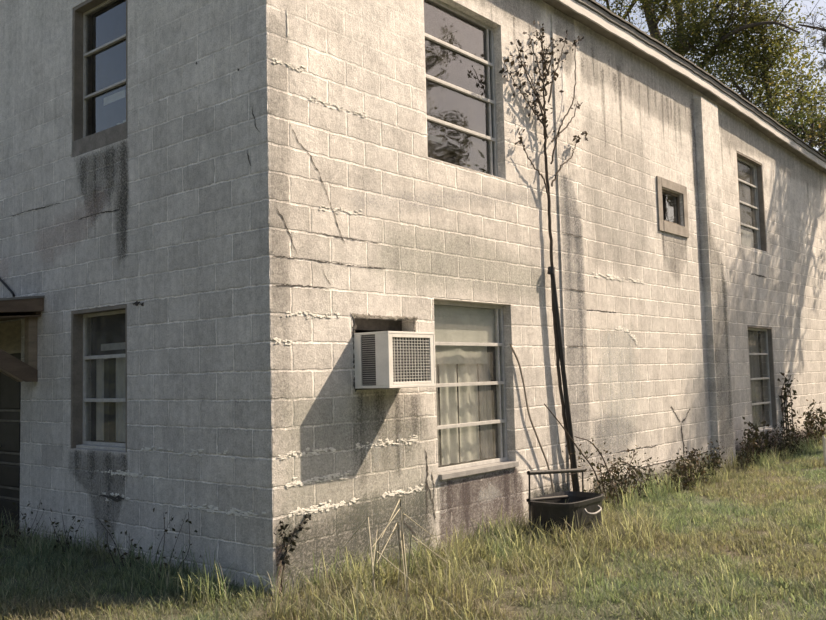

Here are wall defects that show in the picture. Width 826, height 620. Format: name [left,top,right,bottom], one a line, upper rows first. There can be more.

crack [273,130,385,289]
peeling [355,435,418,449]
peeling [277,445,336,460]
peeling [285,470,351,489]
peeling [382,484,423,498]
peeling [288,497,360,518]